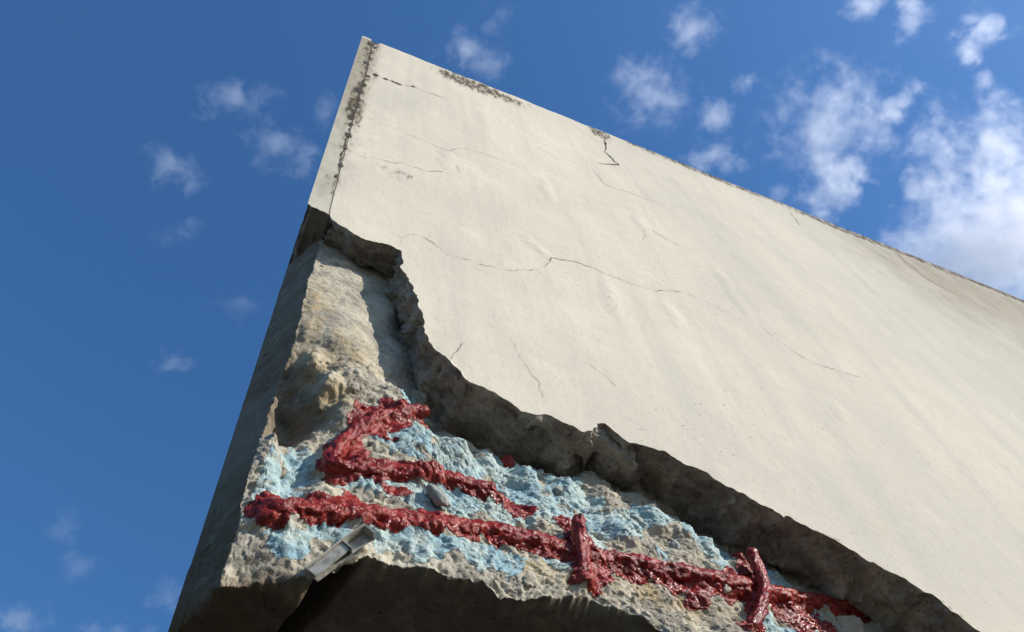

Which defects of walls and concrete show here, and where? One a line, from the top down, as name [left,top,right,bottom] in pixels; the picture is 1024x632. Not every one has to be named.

mould [346,41,377,126]
crack [335,42,493,178]
mould [440,70,520,105]
crack [574,135,689,249]
spalling [168,204,980,632]